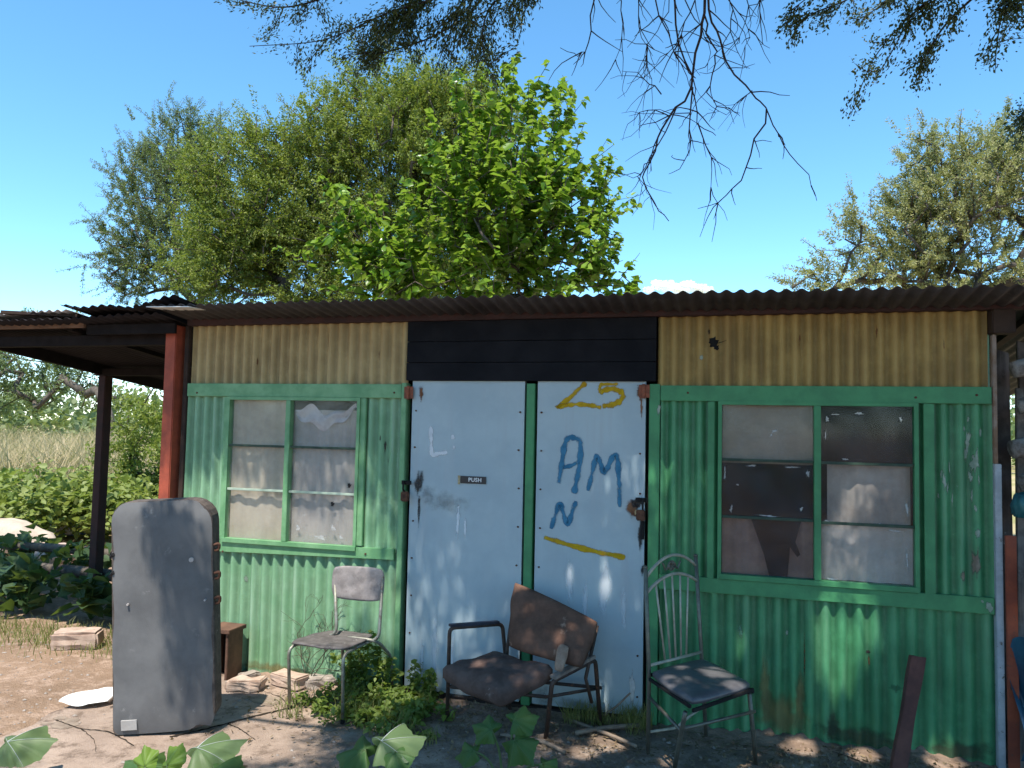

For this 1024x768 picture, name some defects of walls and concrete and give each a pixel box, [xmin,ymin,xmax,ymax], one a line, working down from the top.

peeling [963,417,981,511]
corrosion [626,499,642,548]